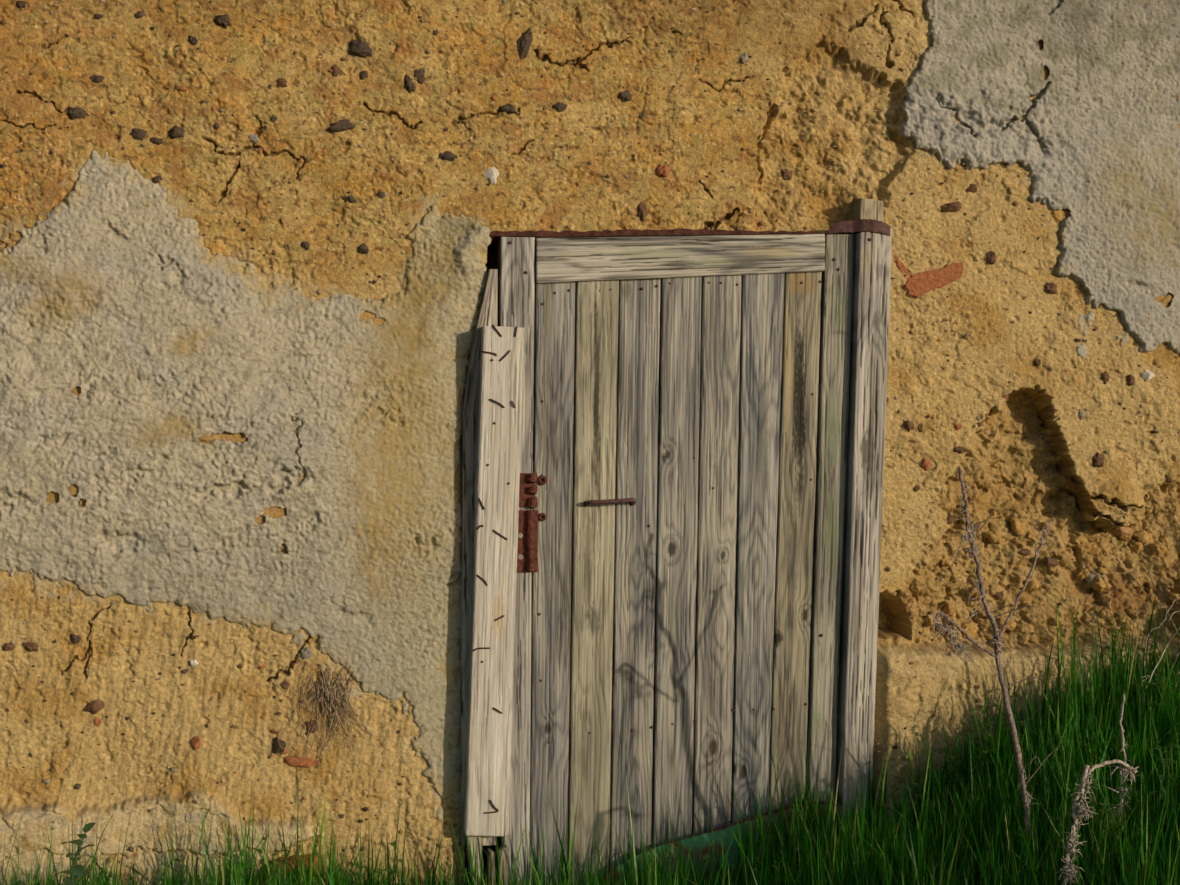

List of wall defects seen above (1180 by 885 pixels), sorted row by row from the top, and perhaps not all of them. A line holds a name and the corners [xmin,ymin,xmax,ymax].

crack [848,0,915,69]
crack [0,90,69,131]
crack [202,117,306,203]
crack [361,102,422,130]
crack [450,107,534,155]
peeling [718,0,1180,359]
crack [935,81,1051,152]
peeling [0,150,491,885]
spalling [877,385,1180,652]